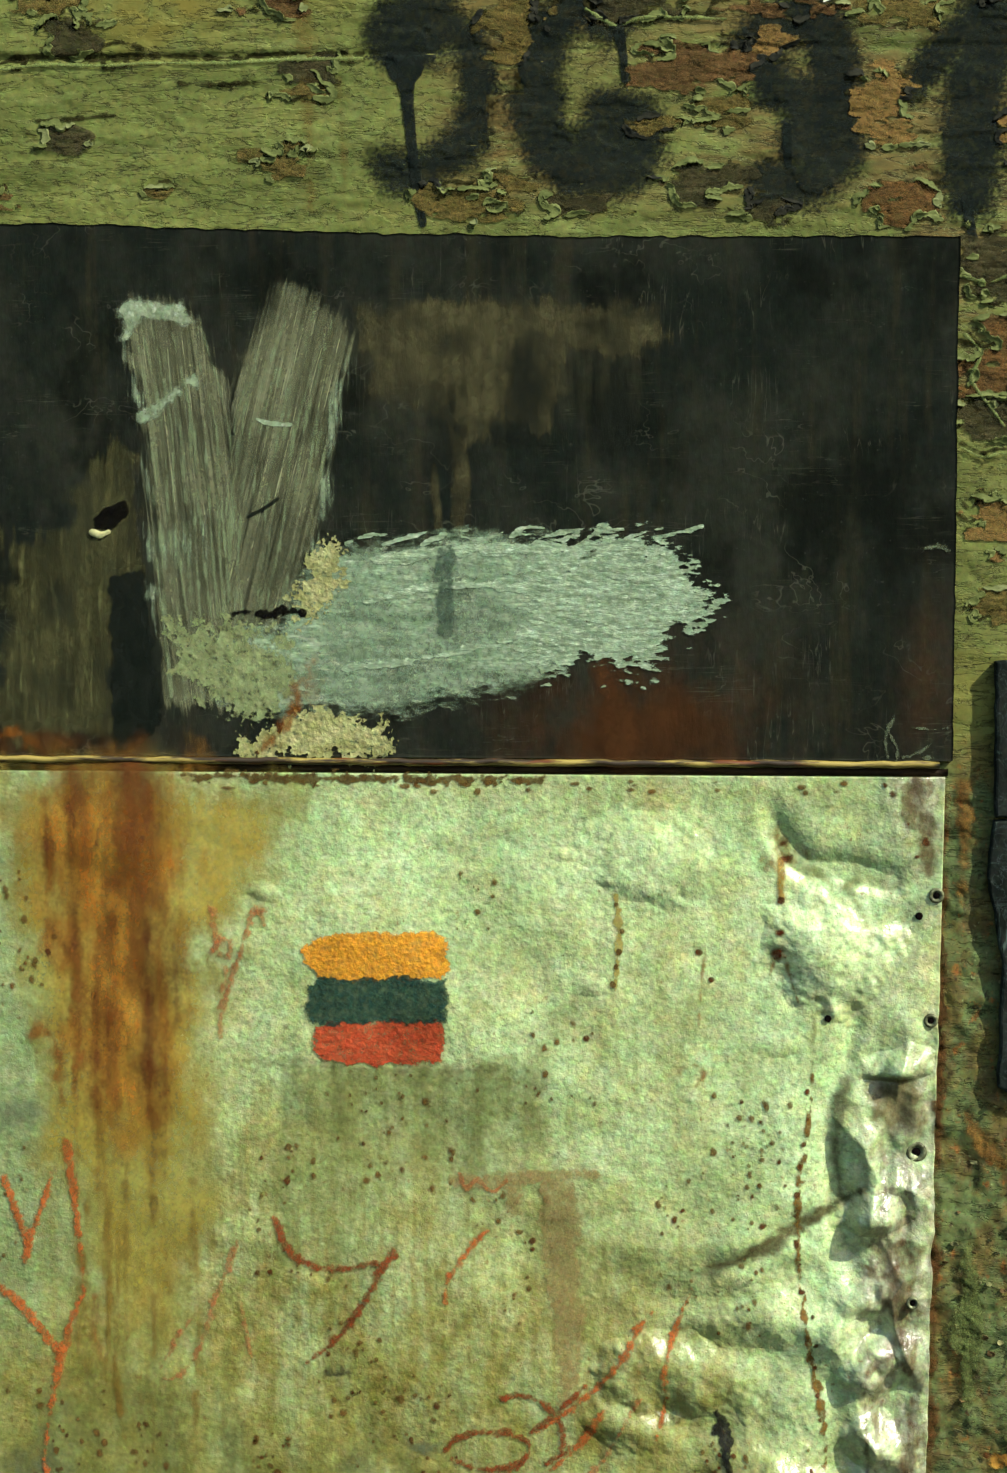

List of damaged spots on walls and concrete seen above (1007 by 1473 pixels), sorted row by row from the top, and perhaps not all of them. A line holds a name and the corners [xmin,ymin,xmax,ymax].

peeling [263,50,356,104]
peeling [584,0,955,143]
peeling [25,119,96,156]
peeling [236,135,319,184]
peeling [405,167,615,225]
peeling [647,155,803,227]
corrosion [0,762,545,1340]
corrosion [832,1078,849,1197]
corrosion [694,1072,828,1473]
corrosion [52,1417,108,1472]
corrosion [102,1358,169,1470]
corrosion [326,1318,454,1444]